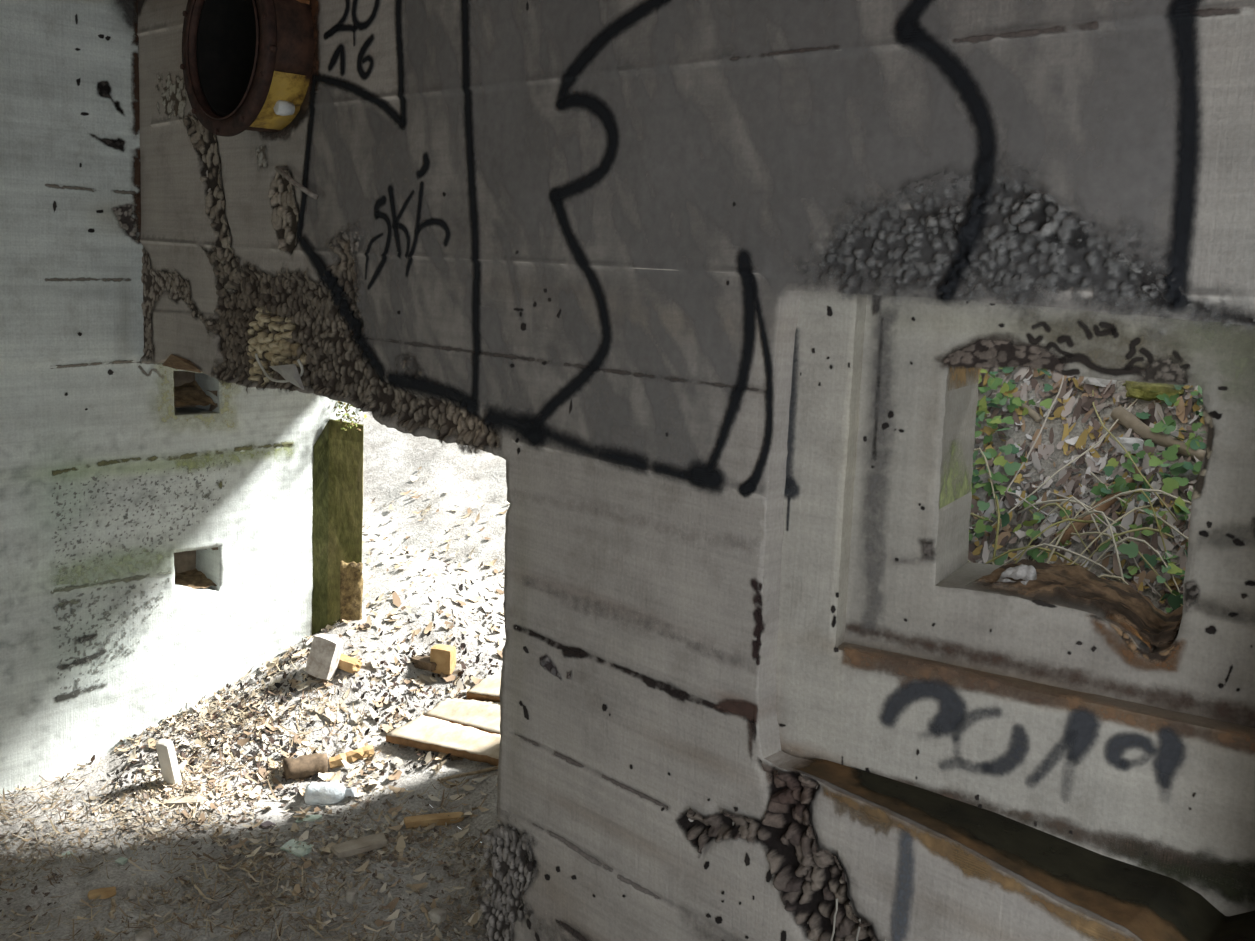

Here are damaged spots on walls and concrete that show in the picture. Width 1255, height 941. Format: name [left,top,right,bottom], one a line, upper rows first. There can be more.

corrosion [309,0,320,90]
corrosion [259,128,291,140]
spalling [91,74,500,454]
spalling [514,289,561,331]
spalling [937,323,1065,373]
spalling [810,162,1255,335]
crack [513,625,757,739]
spalling [1068,615,1183,671]
spalling [475,824,576,941]
spalling [676,760,877,941]